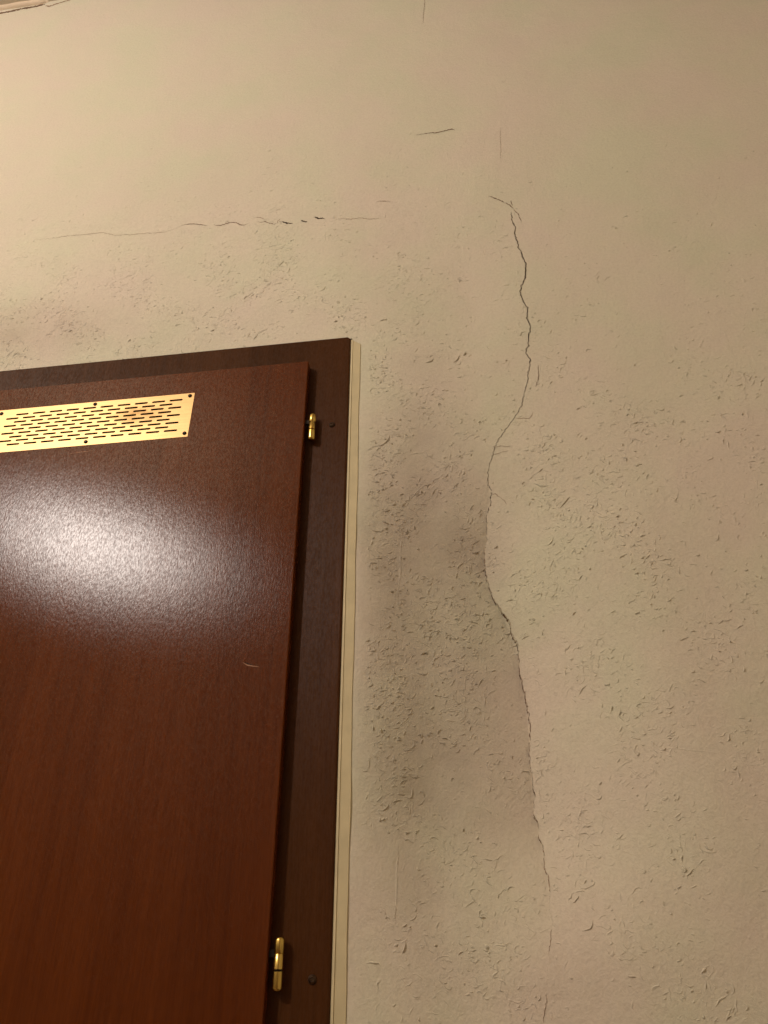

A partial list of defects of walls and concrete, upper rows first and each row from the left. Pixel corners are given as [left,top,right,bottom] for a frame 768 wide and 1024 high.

crack [484,196,553,971]